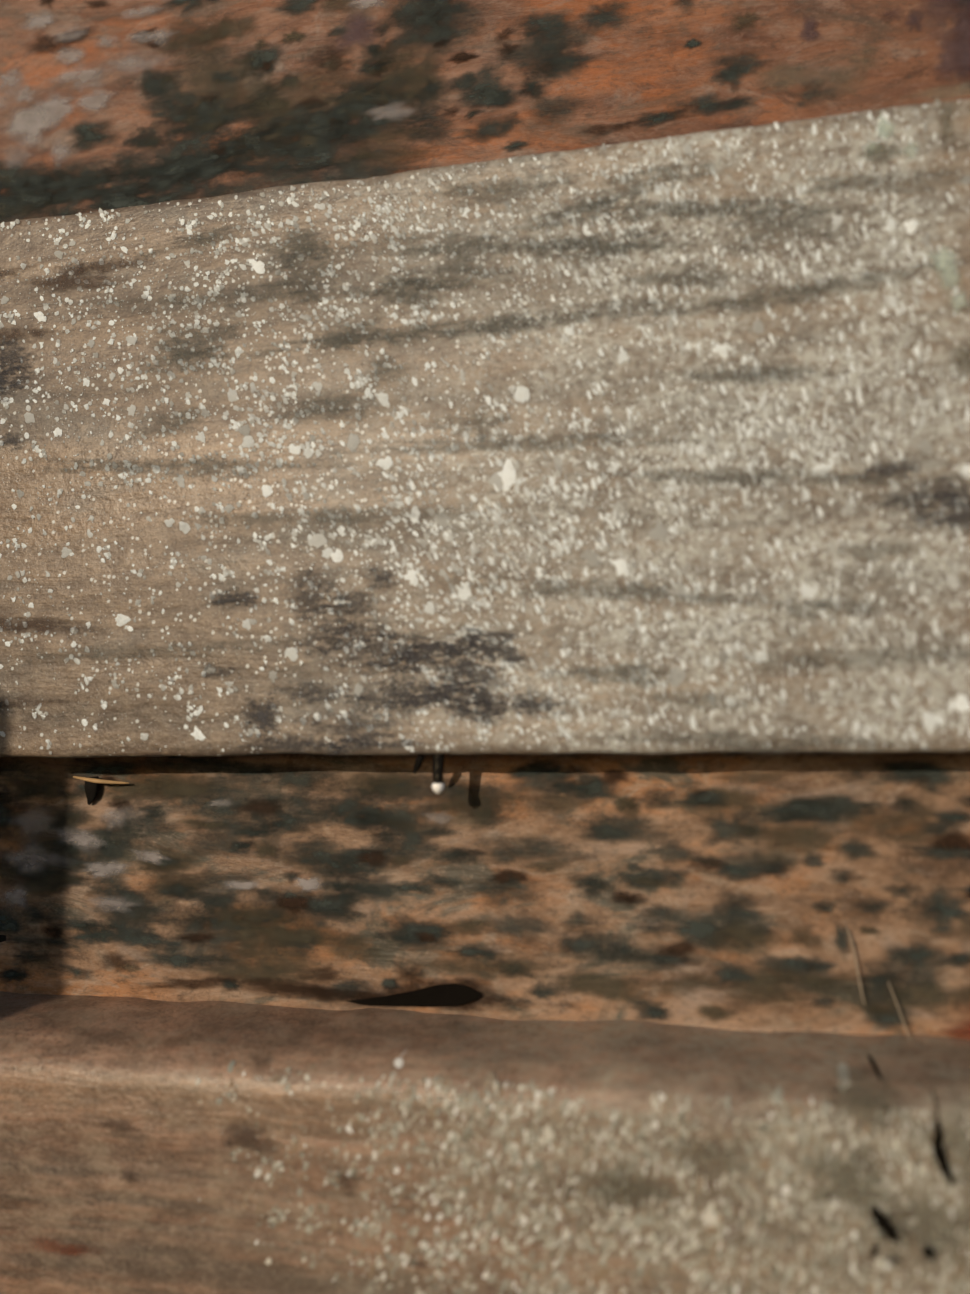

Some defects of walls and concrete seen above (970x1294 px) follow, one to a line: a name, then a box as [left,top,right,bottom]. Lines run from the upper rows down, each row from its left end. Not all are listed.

mould [0,0,588,223]
mould [588,54,757,133]
damp [32,260,130,290]
damp [854,461,970,529]
damp [0,569,865,1006]
mould [895,797,970,859]
mould [886,887,970,932]
mould [531,973,666,1019]
mould [870,944,970,1026]
crack [868,1054,882,1081]
crack [931,1089,954,1184]
crack [870,1206,935,1262]